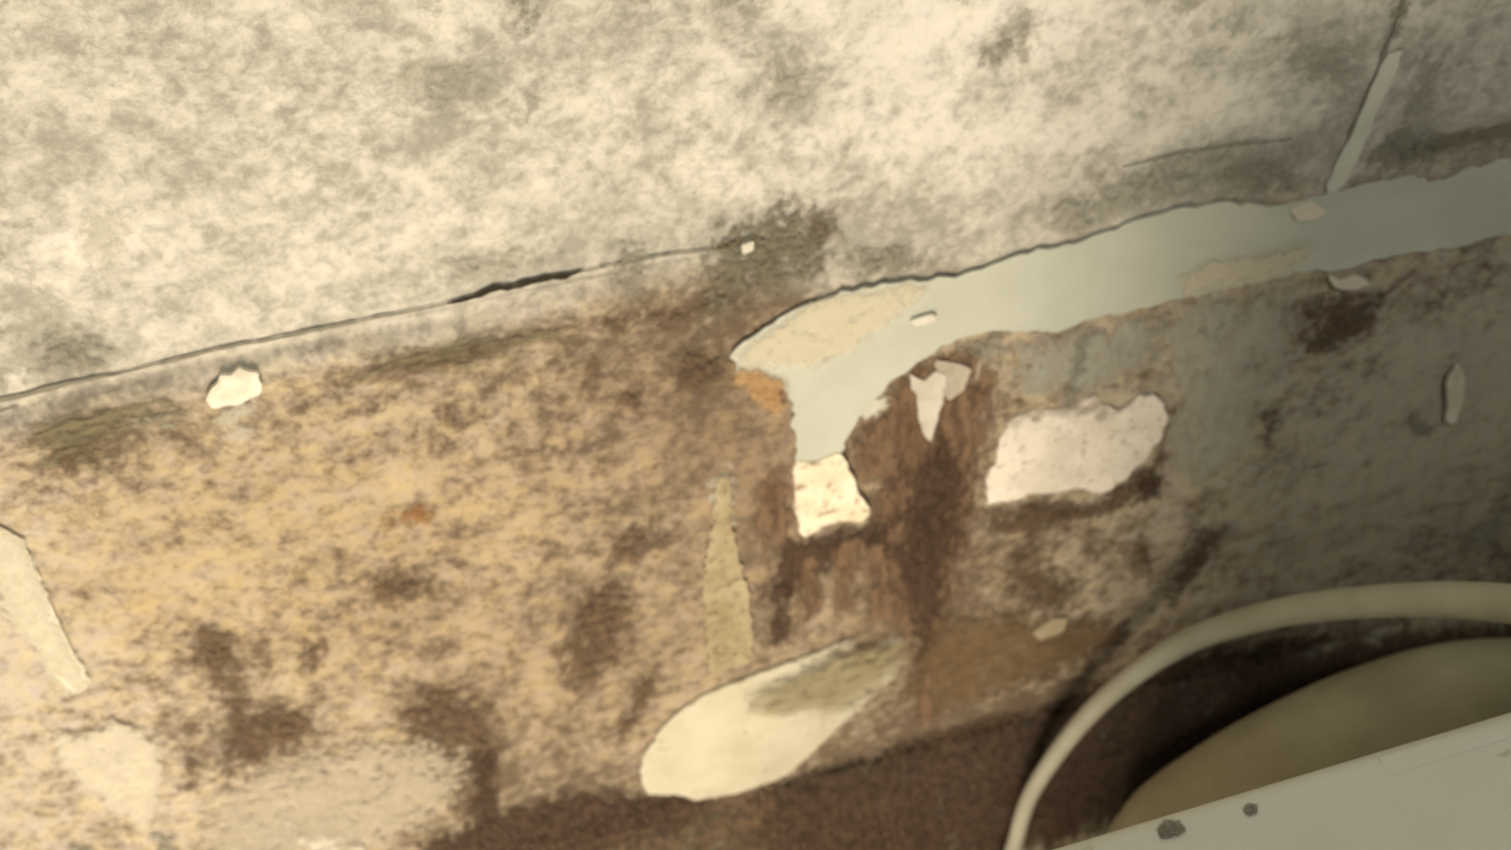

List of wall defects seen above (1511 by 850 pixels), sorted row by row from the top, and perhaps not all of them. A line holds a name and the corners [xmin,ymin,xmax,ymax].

crack [1347,0,1410,142]
crack [0,238,765,412]
leakage [344,329,575,379]
leakage [602,198,931,333]
peeling [729,158,1511,537]
leakage [1293,287,1399,355]
leakage [32,400,192,474]
leakage [392,331,1511,850]
peeling [40,720,166,829]
leakage [175,626,329,795]
peeling [196,735,471,850]